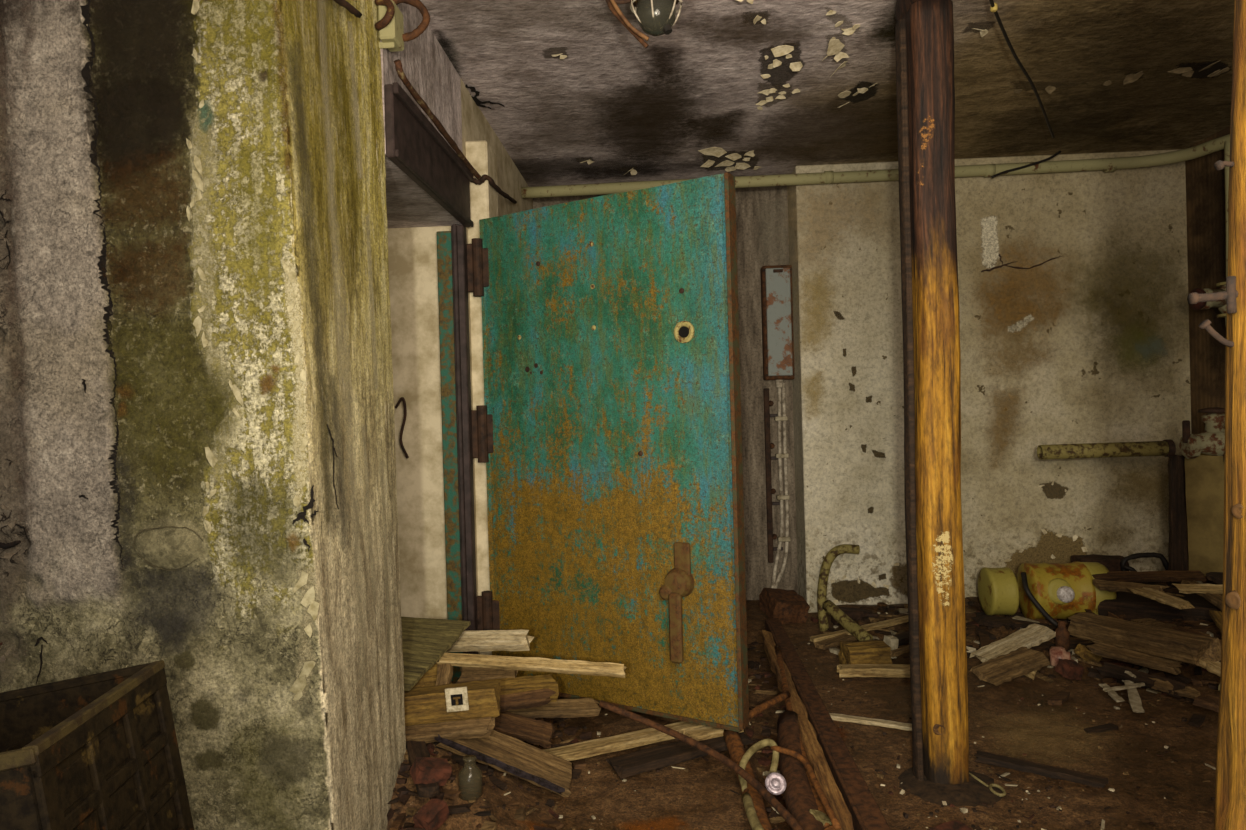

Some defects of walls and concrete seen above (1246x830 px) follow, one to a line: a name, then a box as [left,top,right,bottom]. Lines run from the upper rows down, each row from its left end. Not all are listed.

damp [438,34,457,69]
damp [689,20,802,44]
peeling [822,10,860,76]
damp [515,48,741,178]
peeling [756,42,805,110]
damp [758,99,898,162]
peeling [837,81,878,108]
peeling [698,147,761,172]
crack [981,254,1062,272]
peeling [843,348,872,403]
peeling [1039,481,1068,499]
peeling [1004,529,1088,577]